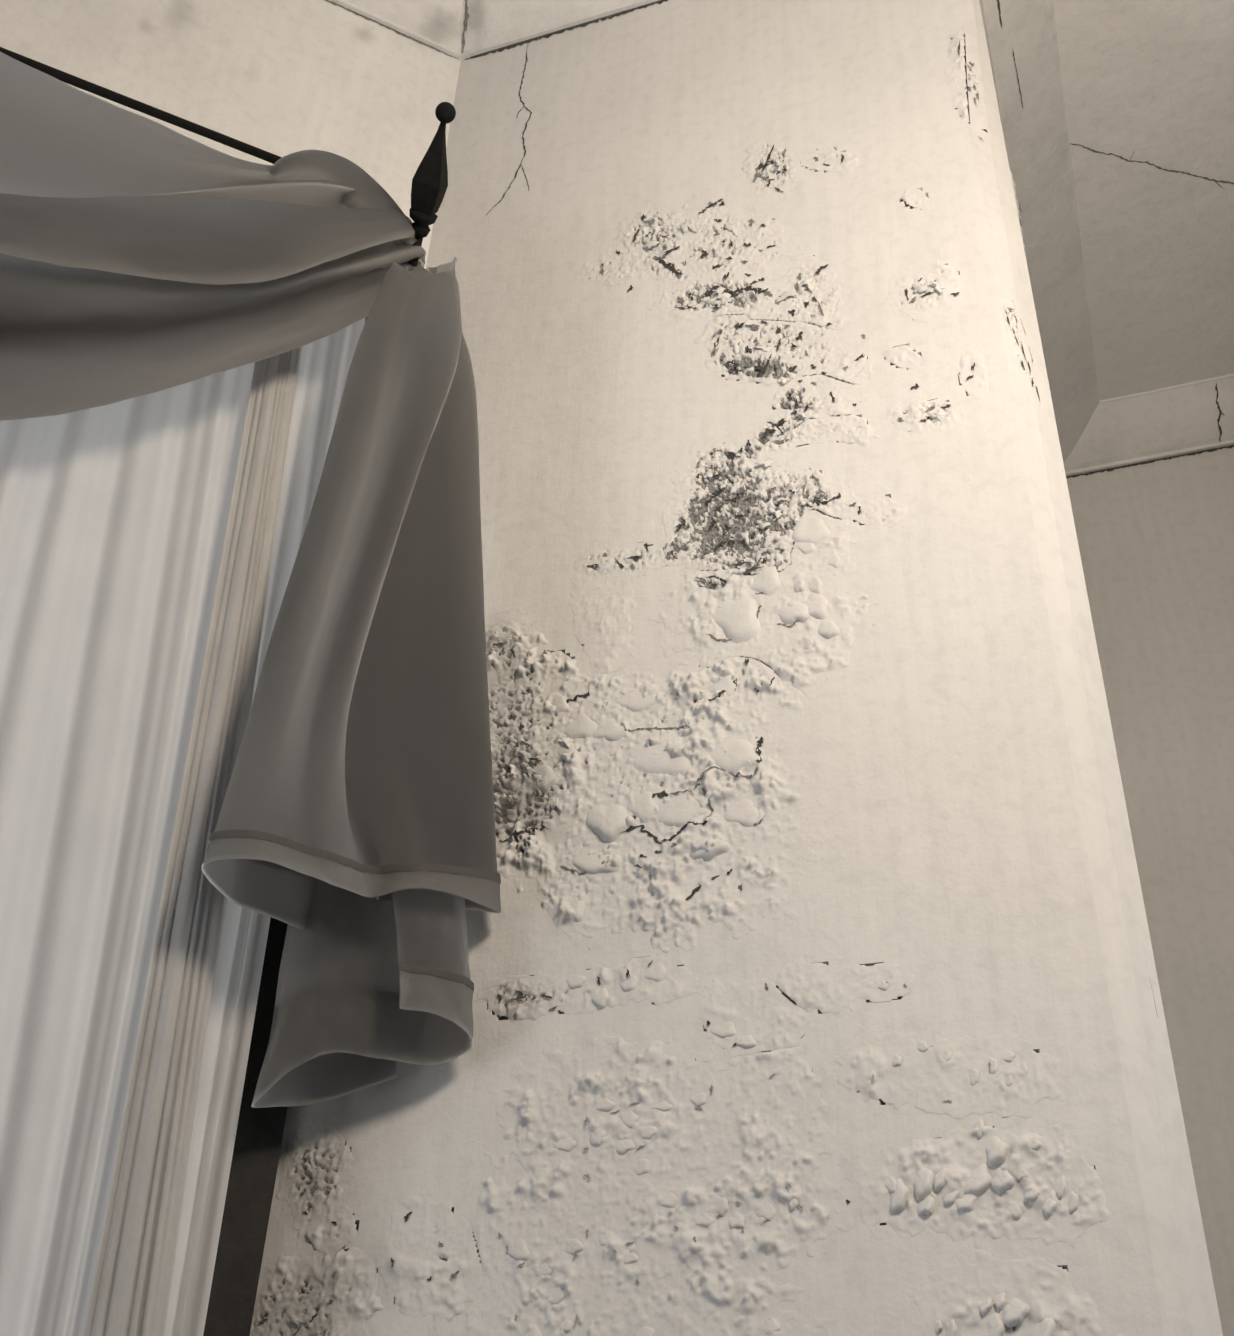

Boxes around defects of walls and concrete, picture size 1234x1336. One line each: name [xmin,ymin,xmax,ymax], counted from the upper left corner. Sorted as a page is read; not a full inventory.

crack [325,0,668,215]
peeling [944,13,988,133]
crack [998,0,1023,106]
crack [1070,143,1234,188]
crack [1066,383,1234,478]
spalling [474,130,989,1058]
peeling [249,1119,384,1336]